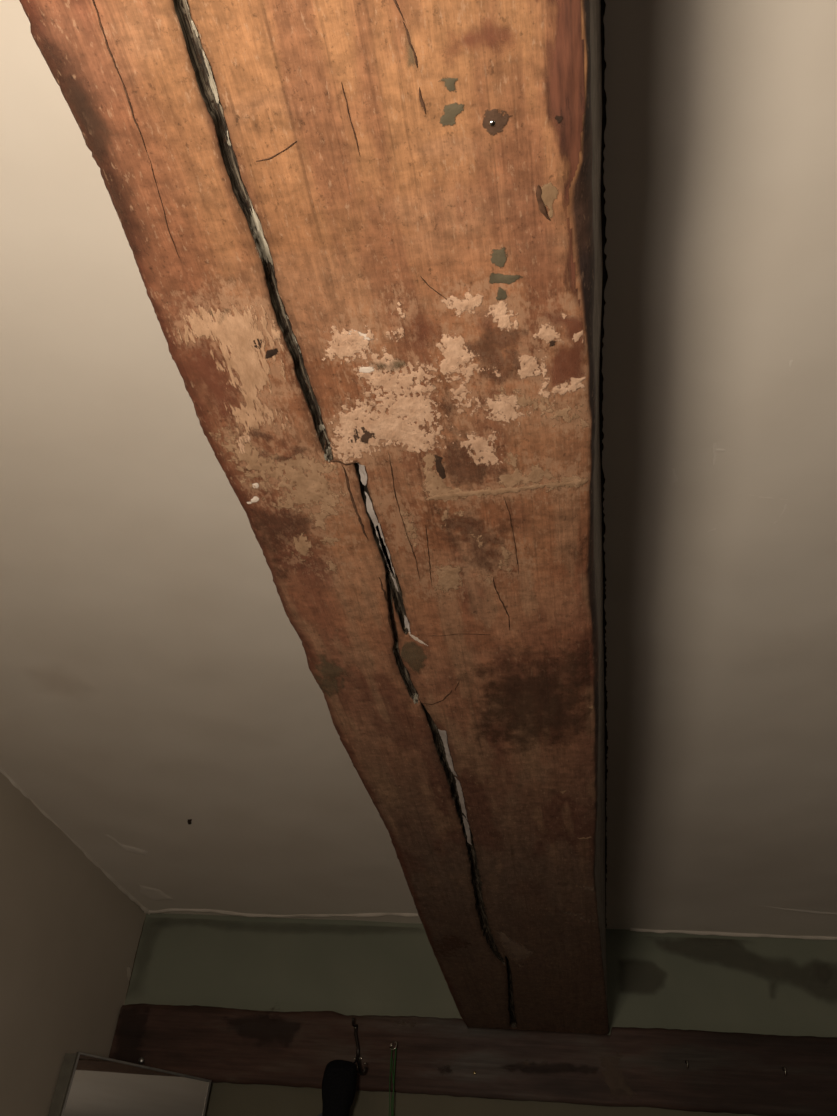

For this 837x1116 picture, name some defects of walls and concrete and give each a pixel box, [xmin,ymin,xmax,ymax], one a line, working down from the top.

crack [173,0,519,1028]
peeling [173,290,590,563]
water stain [662,938,837,998]